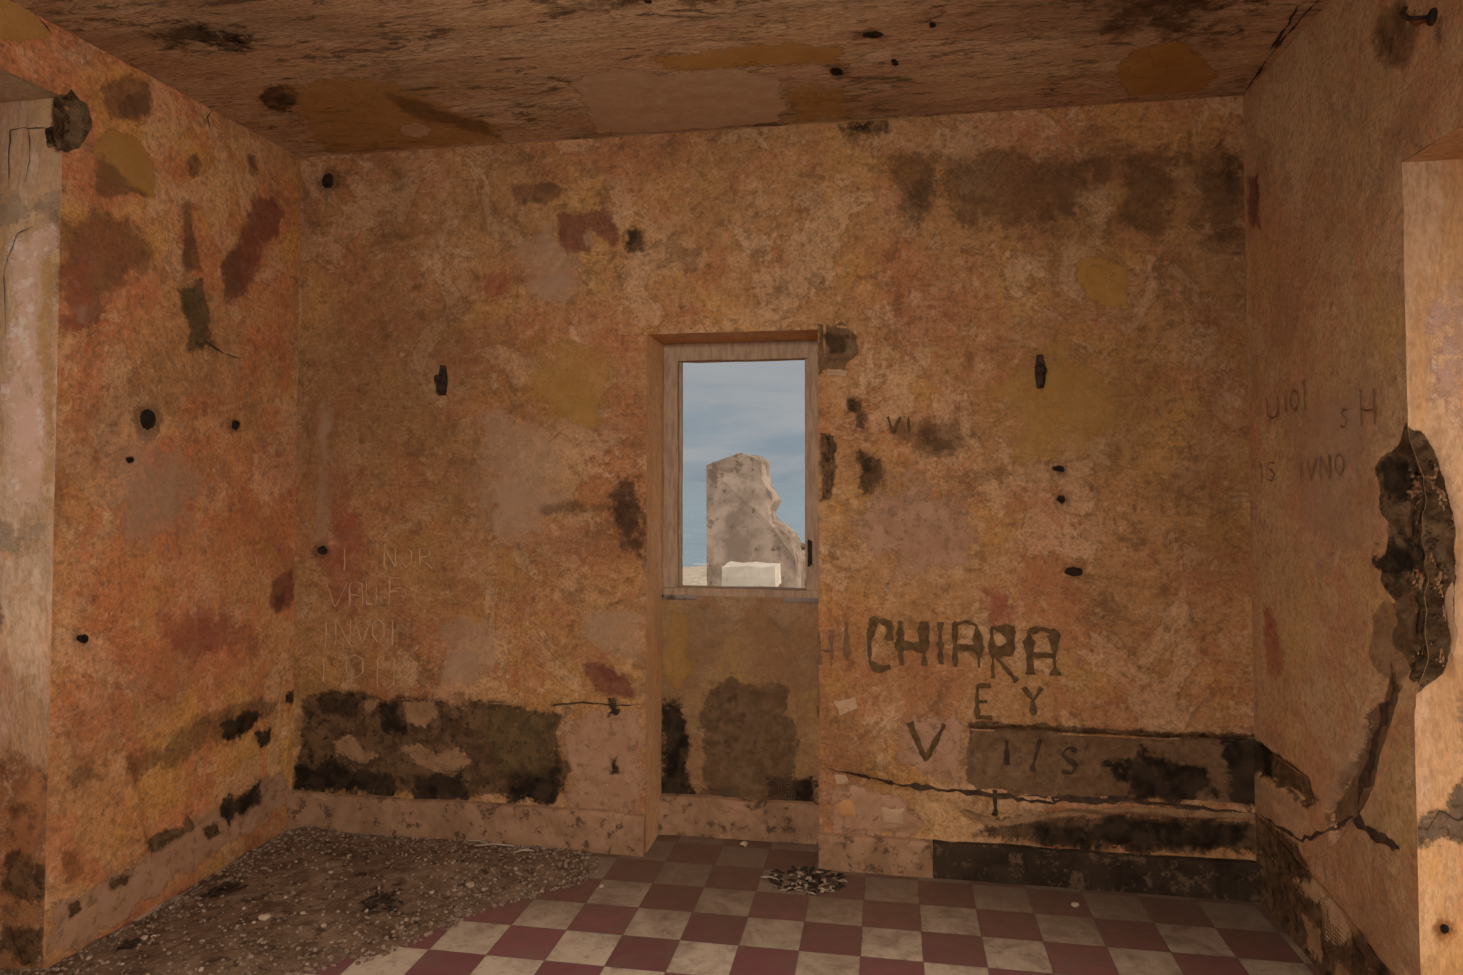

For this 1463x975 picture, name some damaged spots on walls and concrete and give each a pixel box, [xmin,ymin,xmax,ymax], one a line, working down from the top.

leakage [178,278,239,359]
spalling [1372,423,1457,693]
leakage [661,614,819,802]
spalling [821,715,1318,814]
crack [1260,672,1400,852]
leakage [1417,778,1463,849]